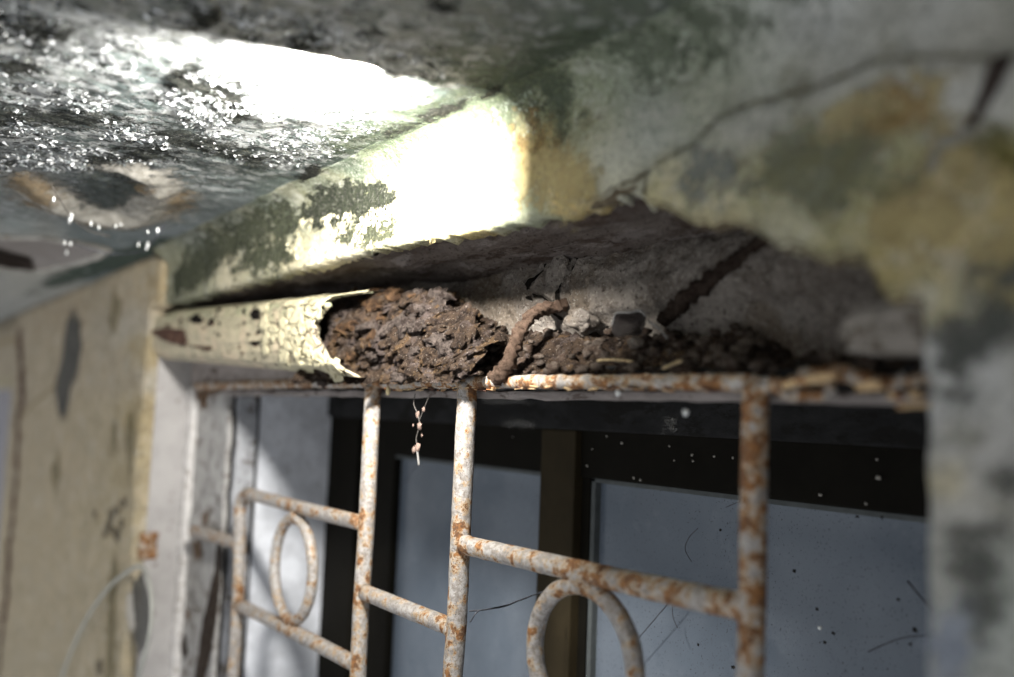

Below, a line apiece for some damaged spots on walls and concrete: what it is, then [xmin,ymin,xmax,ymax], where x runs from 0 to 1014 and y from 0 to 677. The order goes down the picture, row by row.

mould [0,4,83,80]
mould [0,104,281,172]
mould [178,5,227,35]
mould [160,62,274,126]
mould [272,30,335,75]
mould [365,67,402,86]
mould [378,85,503,139]
crack [622,54,992,187]
flaking render [0,235,112,273]
mould [168,163,400,307]
flaking render [152,172,925,383]
water stain [929,257,1014,407]